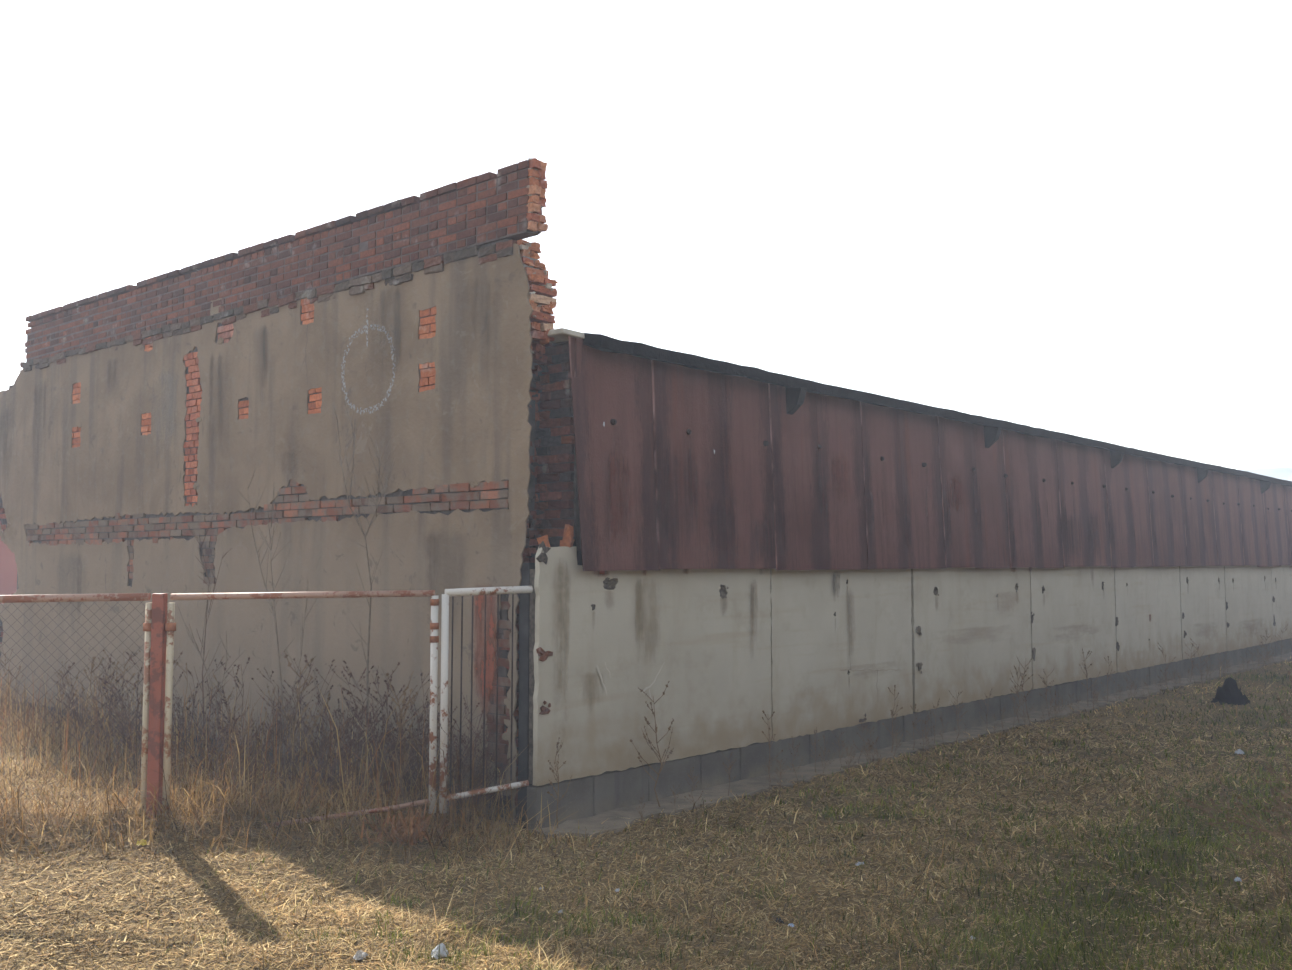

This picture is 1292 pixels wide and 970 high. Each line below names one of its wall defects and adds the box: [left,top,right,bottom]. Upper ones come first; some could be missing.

flaking render [301,298,314,324]
flaking render [419,306,437,339]
spalling [536,524,574,565]